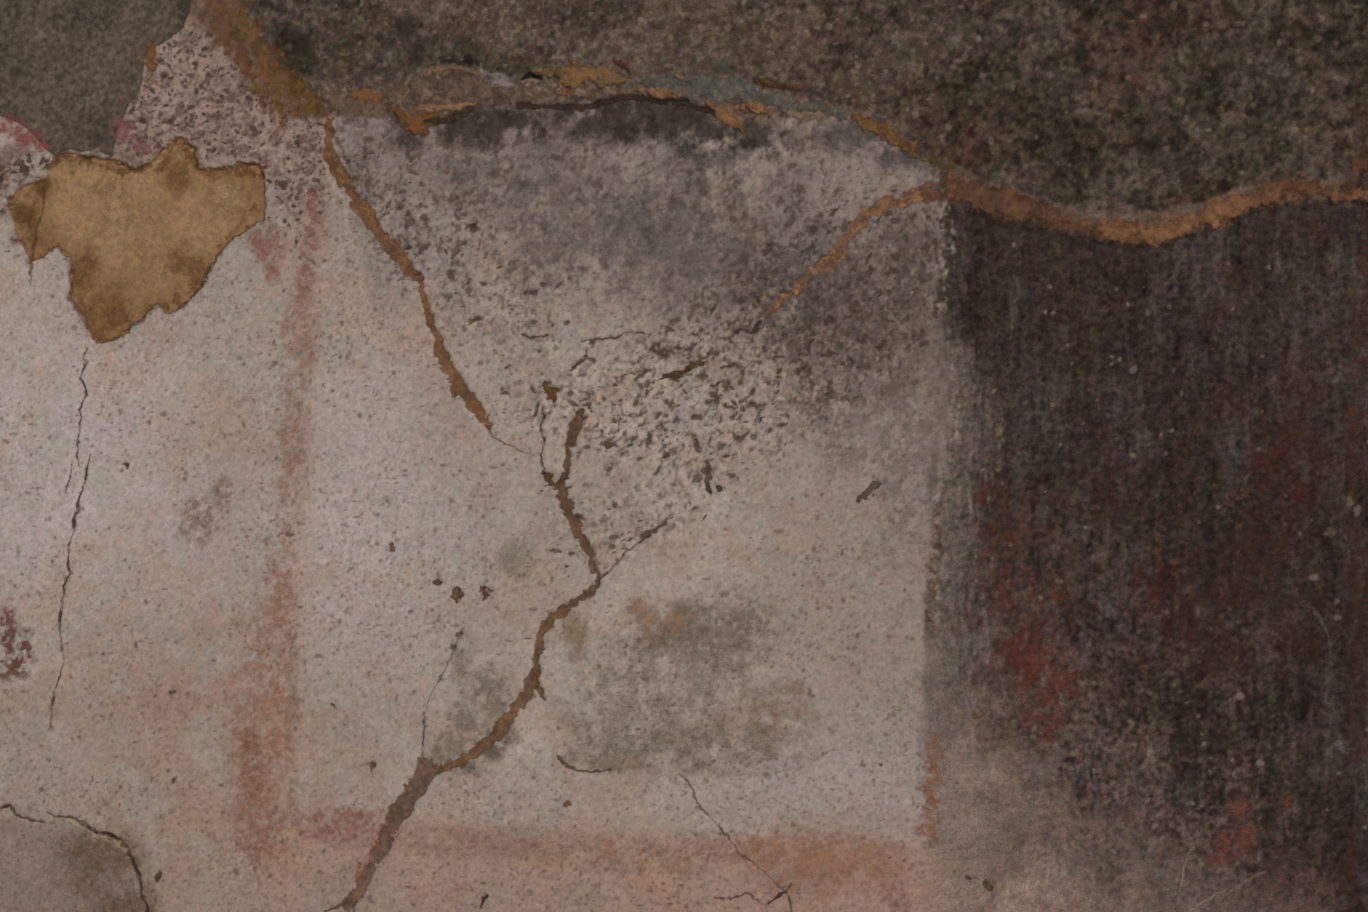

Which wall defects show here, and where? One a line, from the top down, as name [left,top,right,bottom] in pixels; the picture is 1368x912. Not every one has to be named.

spalling [0,32,824,343]
damp [437,96,785,165]
damp [811,121,919,167]
spalling [851,113,955,170]
crack [653,145,1368,381]
spalling [503,211,925,494]
crack [50,348,91,724]
crack [322,101,673,912]
spalling [551,496,657,568]
crack [1,804,149,912]
crack [682,776,792,912]